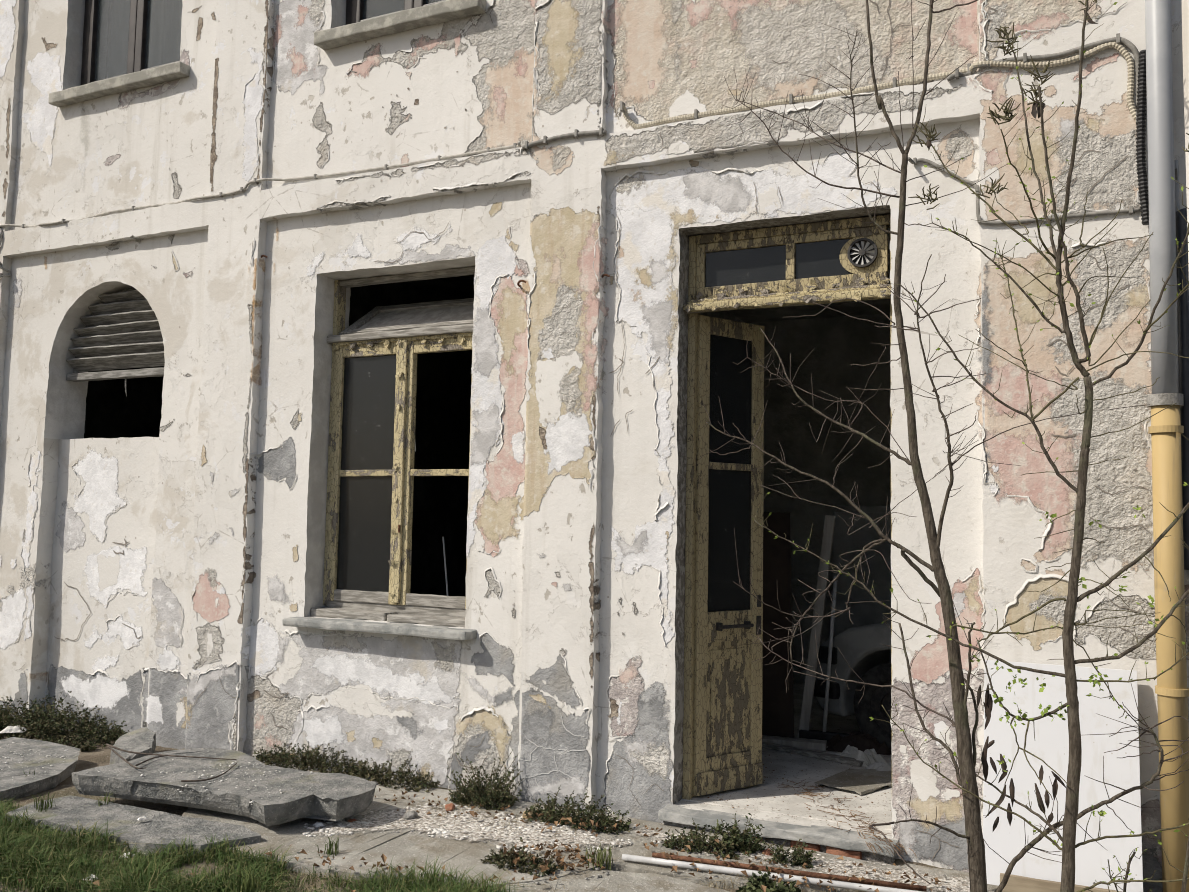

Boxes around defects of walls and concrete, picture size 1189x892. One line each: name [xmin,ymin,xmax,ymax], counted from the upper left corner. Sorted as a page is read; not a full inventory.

peeling [0,0,16,77]
peeling [2,37,63,217]
flaking render [242,0,332,184]
flaking render [347,0,1156,660]
peeling [56,371,302,674]
flaking render [468,632,582,709]
spalling [588,524,601,688]
flaking render [606,655,644,742]
flaking render [892,568,985,872]